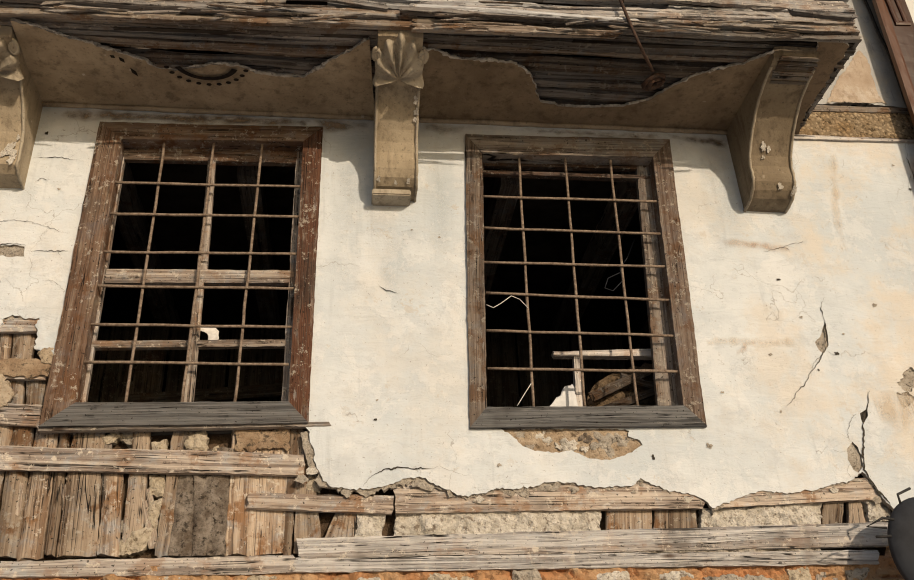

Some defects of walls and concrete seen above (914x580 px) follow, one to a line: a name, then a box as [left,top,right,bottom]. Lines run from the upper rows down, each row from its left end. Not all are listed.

spalling [0,246,24,257]
crack [789,298,838,404]
spalling [815,326,839,355]
spalling [897,368,914,408]
crack [363,466,470,486]
flaking render [294,431,590,503]
spalling [504,429,641,460]
spalling [811,443,882,505]
crack [847,391,894,509]
flaking render [684,496,731,515]